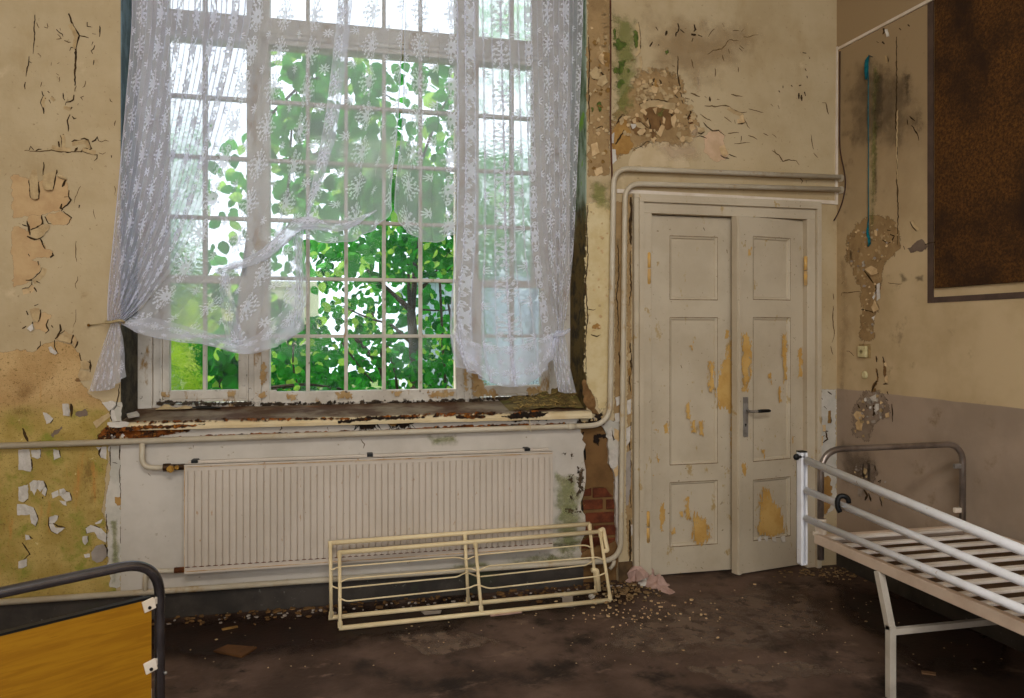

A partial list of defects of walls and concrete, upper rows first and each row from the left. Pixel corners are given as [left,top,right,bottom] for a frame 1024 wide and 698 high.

crack [24,13,116,161]
peeling [585,0,735,177]
crack [668,23,818,184]
peeling [844,215,901,342]
peeling [0,162,125,599]
corrosion [137,410,566,436]
damp [563,452,585,515]
peeling [577,195,633,583]
peeling [659,496,713,546]
peeling [707,330,752,476]
peeling [755,487,788,542]
peeling [851,356,893,442]